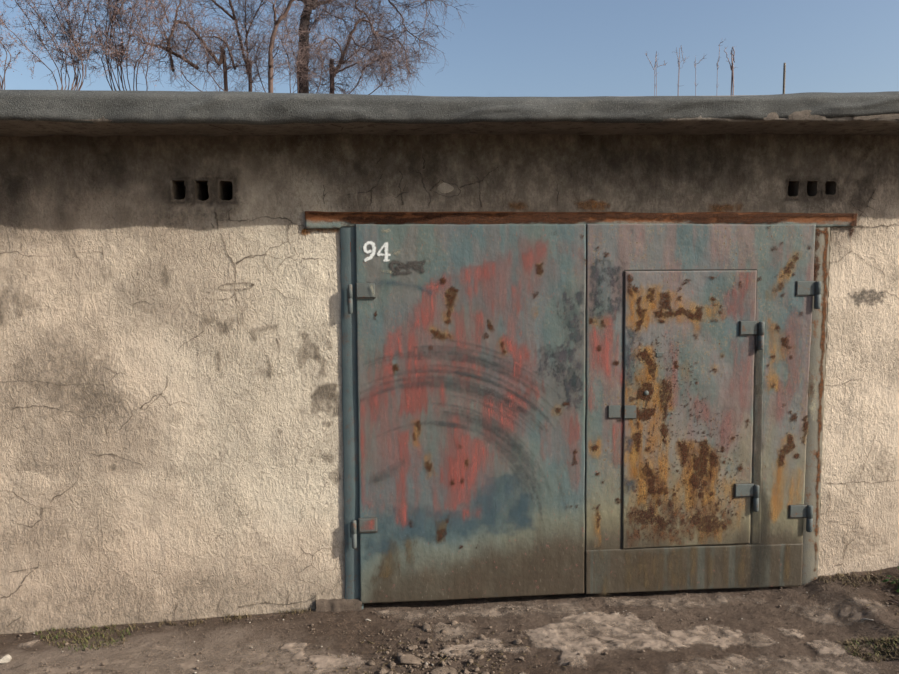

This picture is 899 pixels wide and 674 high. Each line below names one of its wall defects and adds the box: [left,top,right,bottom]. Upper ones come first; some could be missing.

crack [211,209,333,332]
crack [837,194,891,276]
spalling [848,289,885,305]
rust [309,200,857,552]
crack [11,378,184,527]